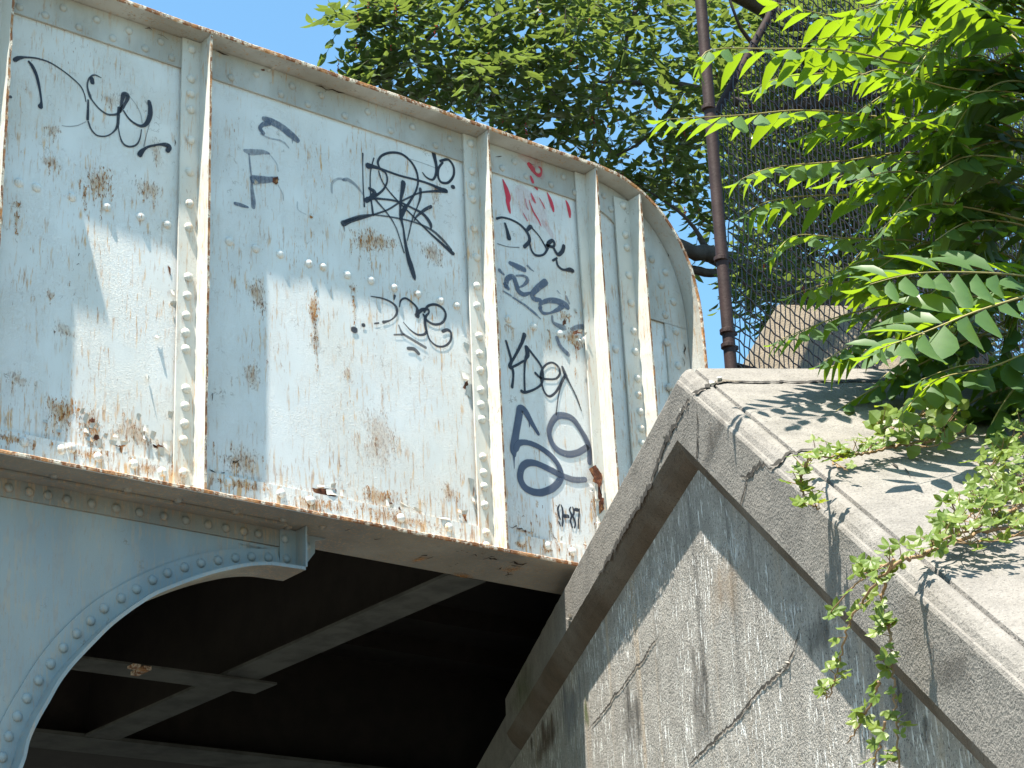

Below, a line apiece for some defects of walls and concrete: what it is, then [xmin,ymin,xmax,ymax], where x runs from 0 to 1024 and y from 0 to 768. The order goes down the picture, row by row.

corrosion [79,166,113,221]
corrosion [350,229,397,258]
corrosion [547,311,583,358]
peeling [77,408,129,453]
peeling [128,413,172,456]
corrosion [212,442,269,493]
peeling [312,483,346,497]
corrosion [289,485,441,534]
crack [598,379,896,575]
crack [590,635,659,727]
crack [689,627,800,765]